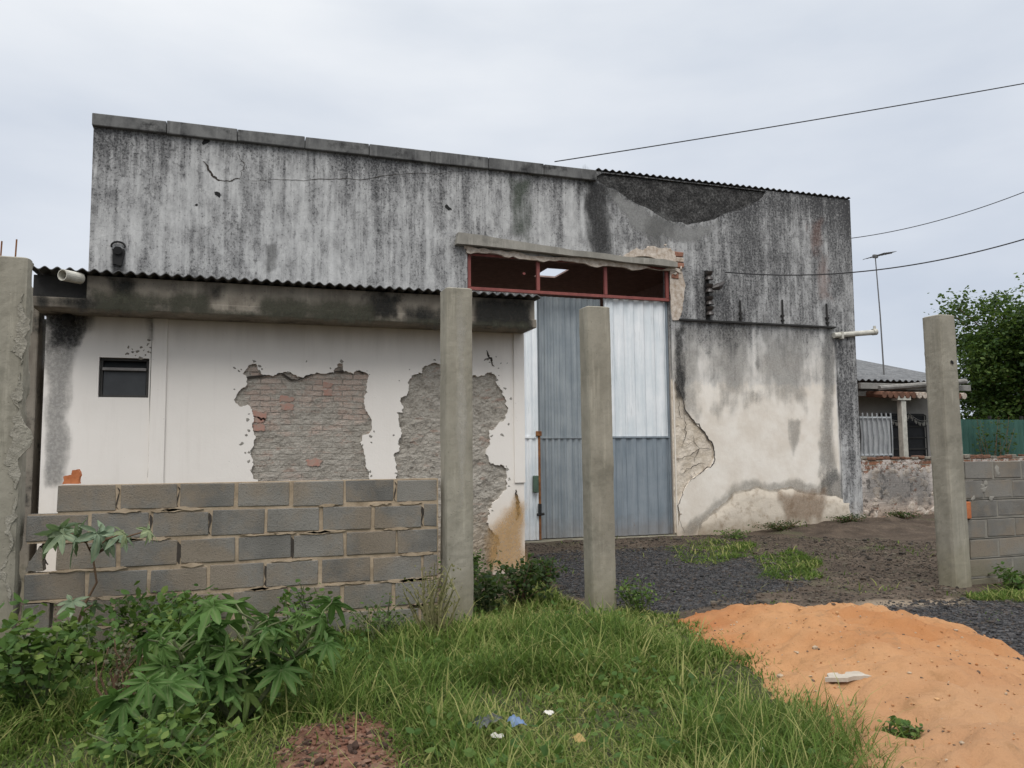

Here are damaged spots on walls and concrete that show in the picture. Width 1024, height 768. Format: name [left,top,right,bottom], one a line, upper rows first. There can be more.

crack [203,152,316,182]
leakage [513,181,530,233]
leakage [585,181,610,254]
spalling [597,174,764,225]
leakage [37,254,440,345]
leakage [472,299,532,331]
spalling [464,244,686,320]
leakage [676,329,685,399]
spalling [233,360,375,481]
spalling [393,359,441,577]
spalling [472,356,512,575]
spalling [671,379,713,533]